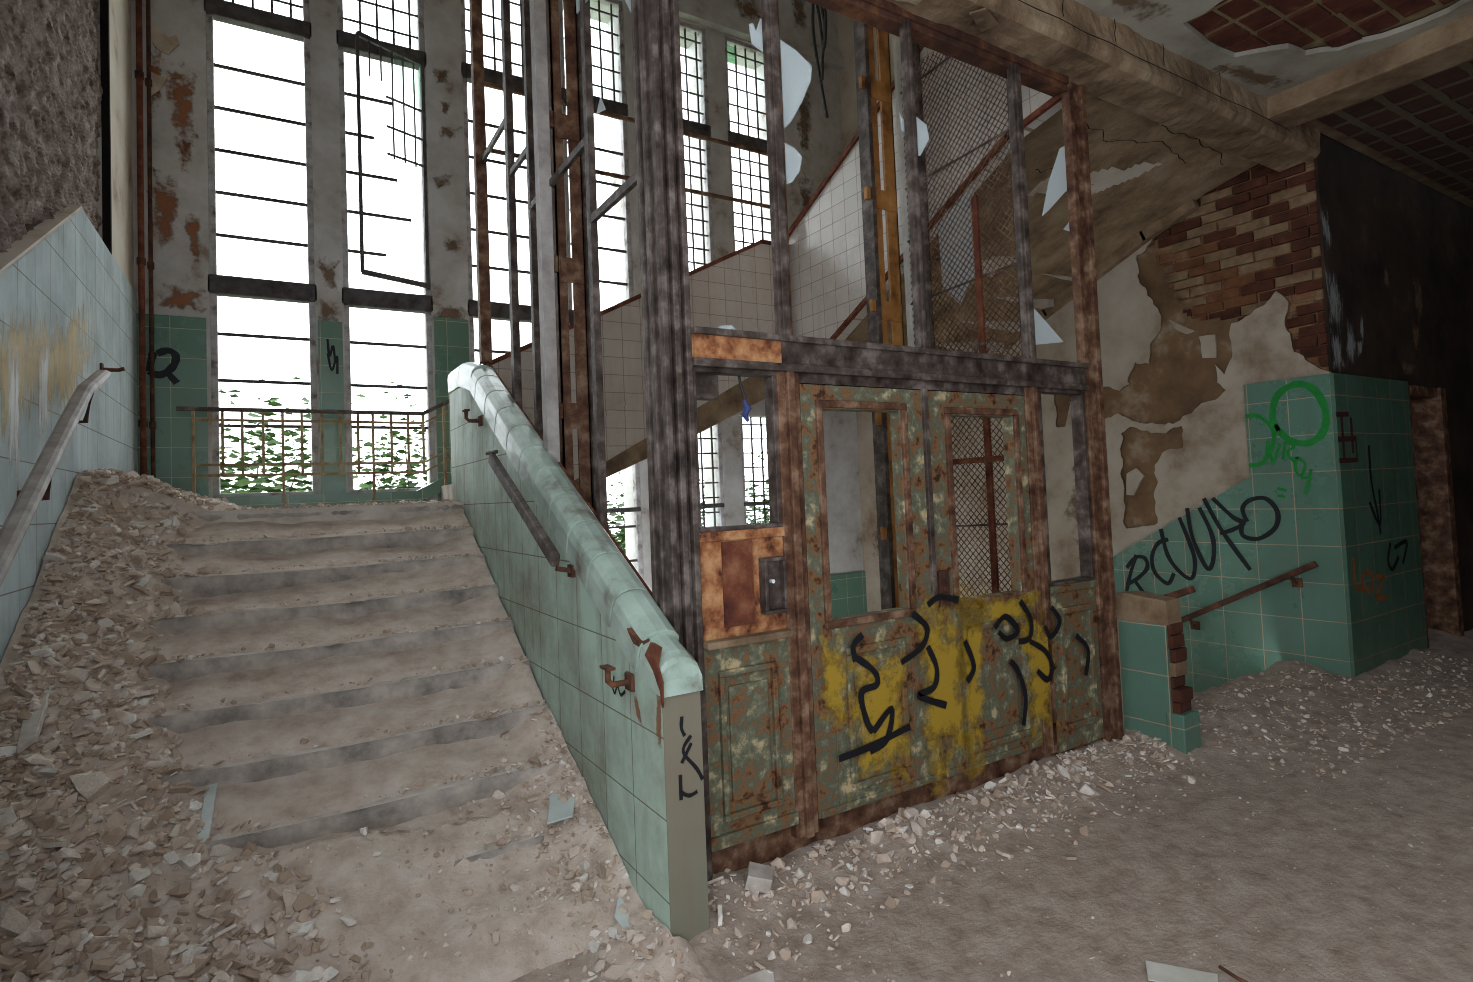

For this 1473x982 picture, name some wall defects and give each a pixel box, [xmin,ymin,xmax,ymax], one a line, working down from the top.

peeling [0,0,103,253]
crack [1087,123,1224,165]
spalling [1103,162,1364,528]
peeling [1056,395,1070,427]
spalling [645,642,664,708]